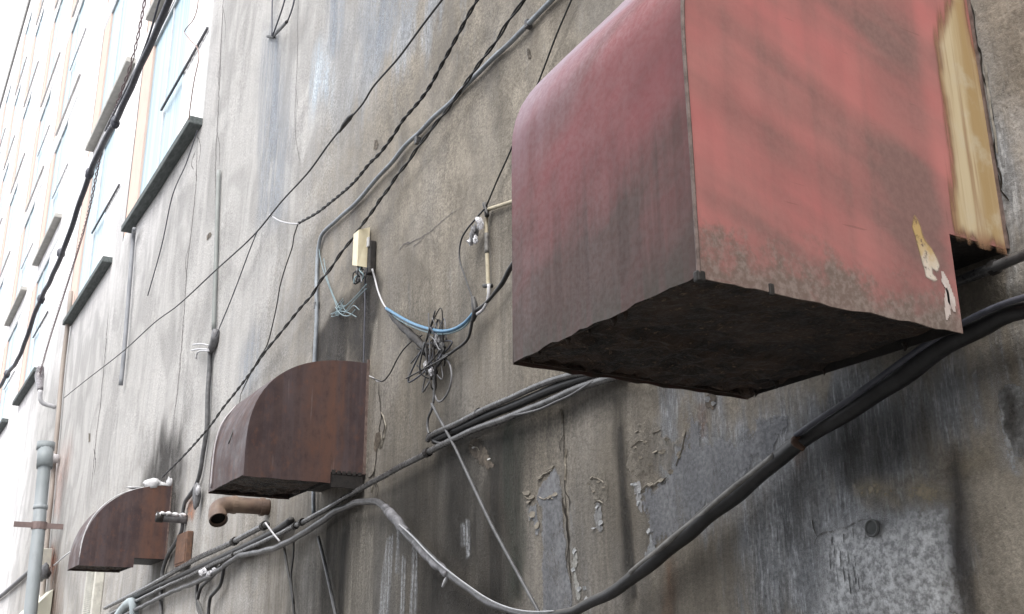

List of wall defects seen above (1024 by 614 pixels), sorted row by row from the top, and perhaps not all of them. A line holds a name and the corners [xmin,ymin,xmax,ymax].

peeling [522,466,588,611]
crack [559,409,572,606]
peeling [587,476,606,532]
peeling [626,421,680,513]